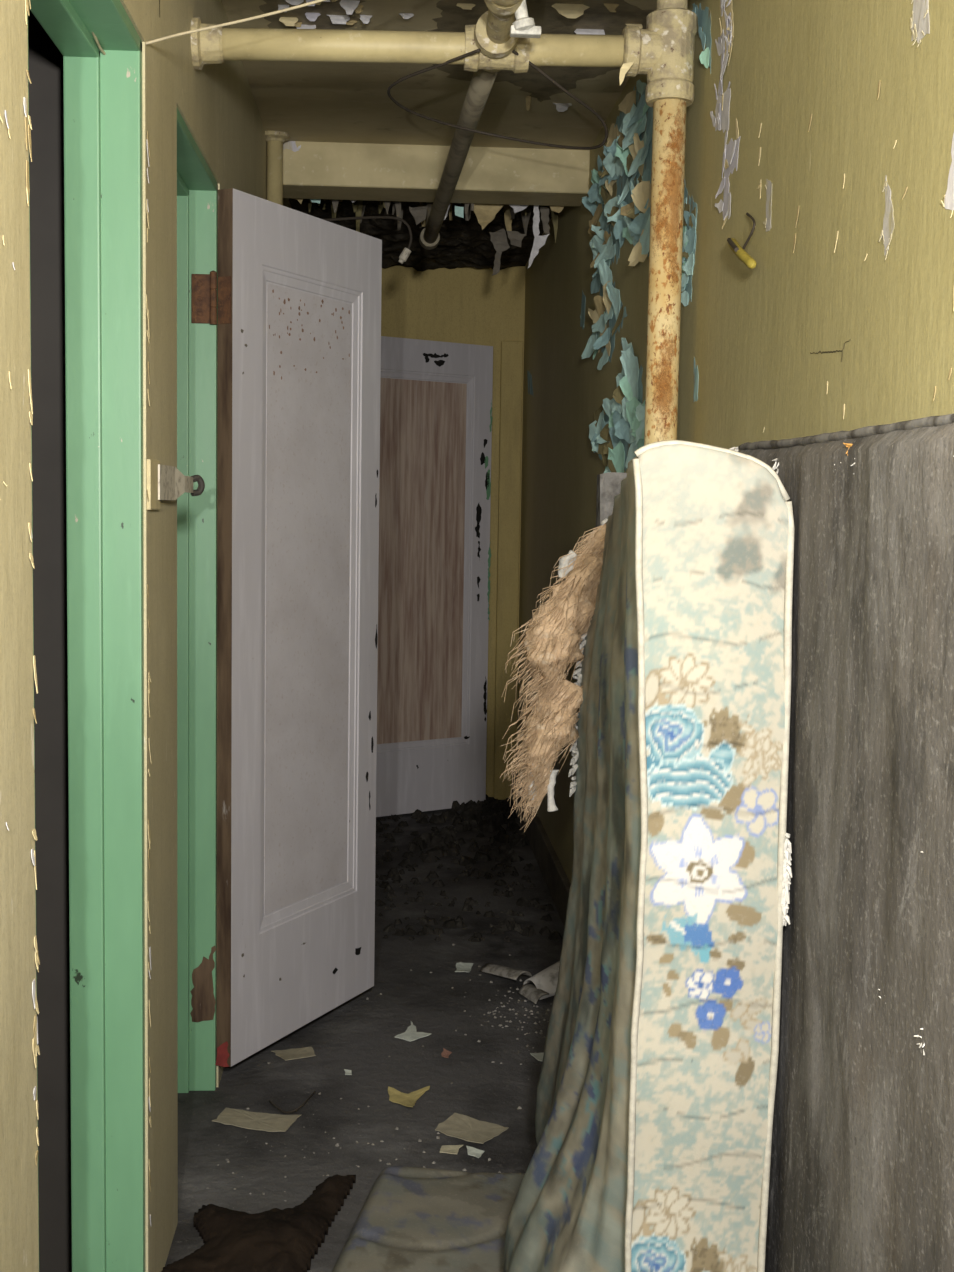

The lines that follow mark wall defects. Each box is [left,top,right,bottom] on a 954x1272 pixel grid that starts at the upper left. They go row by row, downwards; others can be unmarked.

peeling [259,0,372,29]
peeling [910,0,930,47]
peeling [23,69,32,206]
peeling [494,62,653,473]
rust [653,114,684,282]
peeling [681,179,698,307]
peeling [941,134,954,218]
rust [653,334,675,434]
peeling [32,936,40,1068]